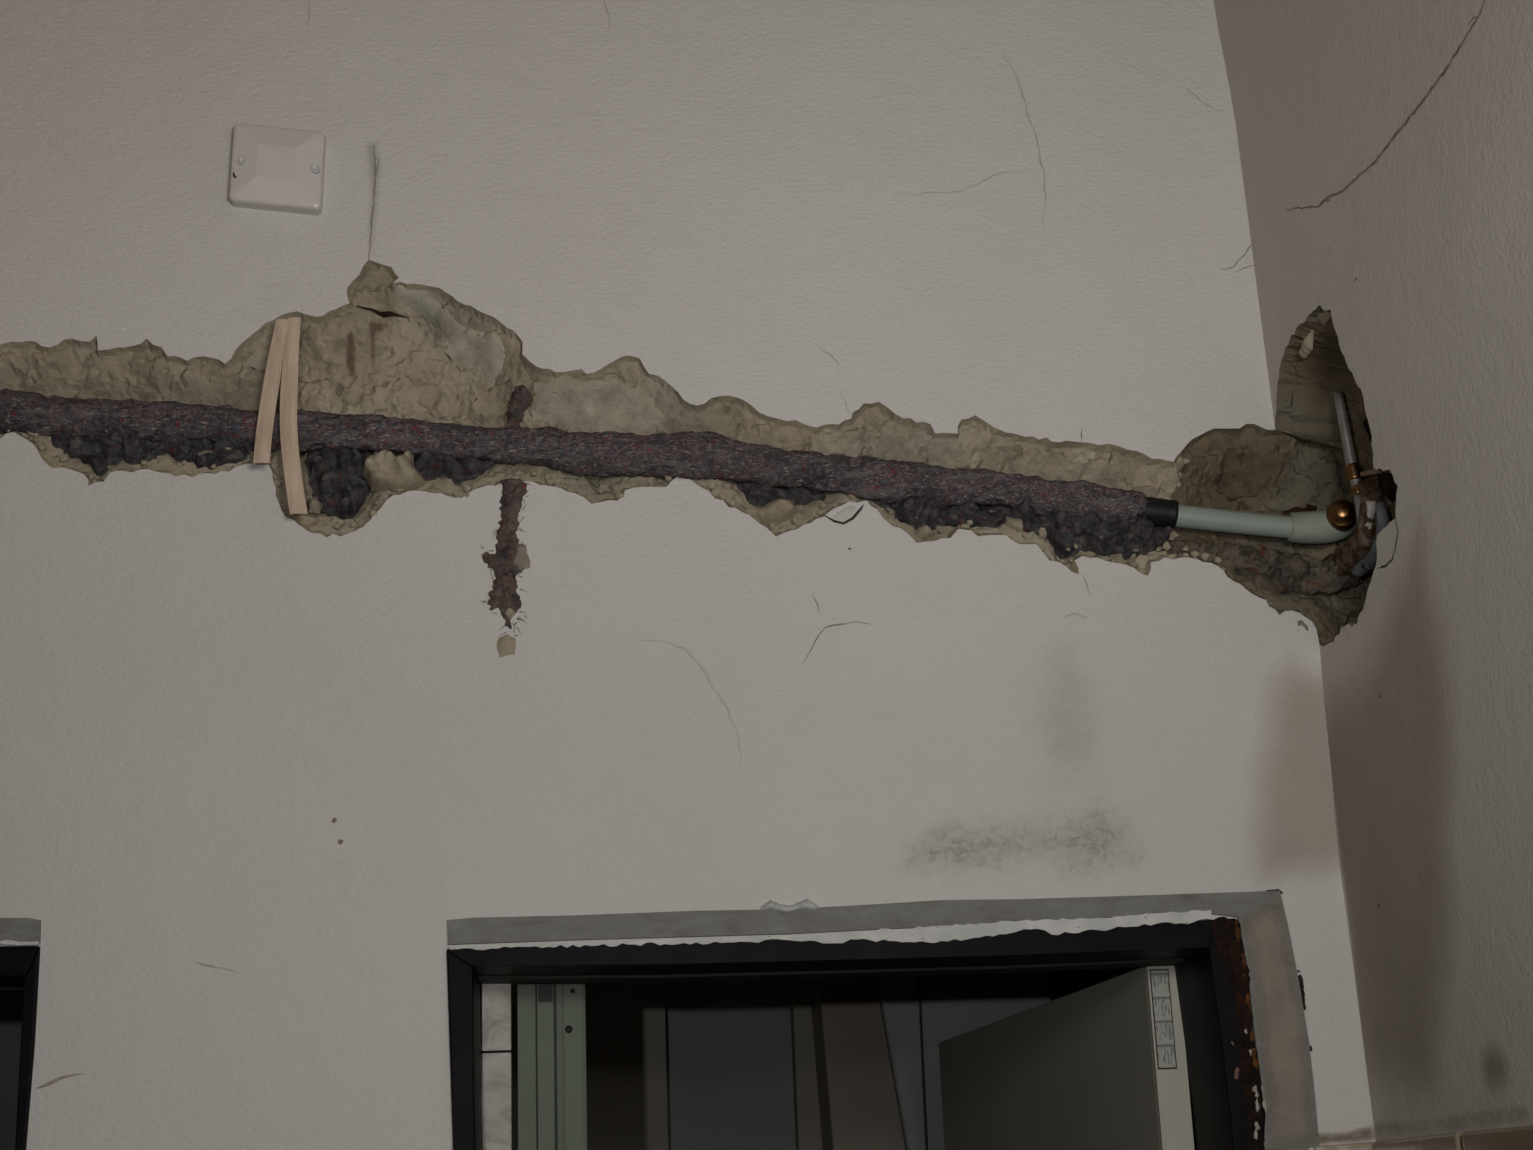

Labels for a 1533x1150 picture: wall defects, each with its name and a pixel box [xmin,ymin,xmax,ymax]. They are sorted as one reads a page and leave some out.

crack [1286,0,1485,211]
flaking render [0,260,1398,522]
flaking render [0,419,1375,658]
crack [641,640,741,765]
crack [803,595,873,663]
rust [1211,917,1267,1150]